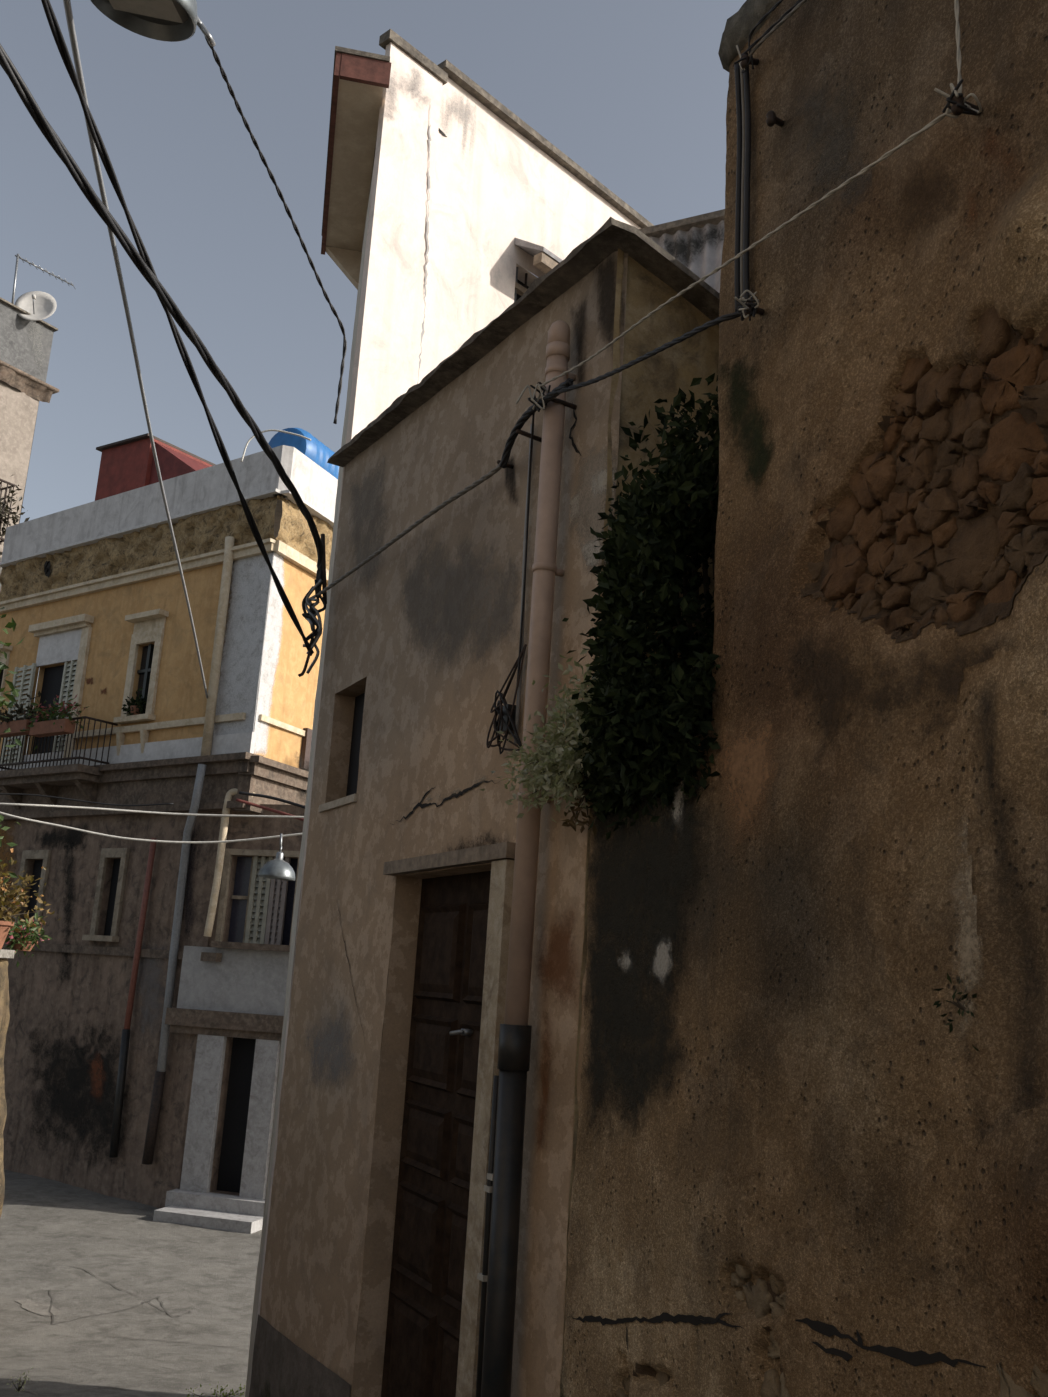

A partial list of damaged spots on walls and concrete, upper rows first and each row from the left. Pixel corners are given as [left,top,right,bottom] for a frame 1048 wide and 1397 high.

spalling [800,306,1048,643]
crack [392,778,495,825]
water stain [586,770,706,1130]
water stain [959,869,979,1009]
water stain [30,1024,128,1163]
spalling [616,1362,670,1397]
crack [569,1312,744,1350]
crack [795,1318,986,1368]